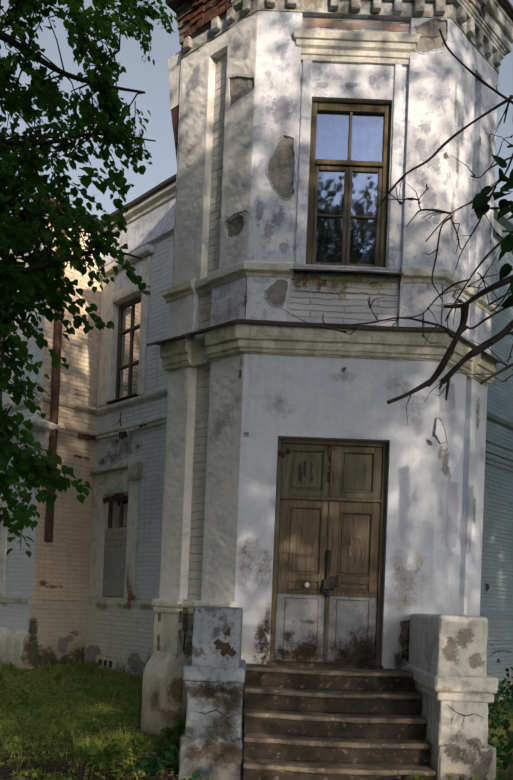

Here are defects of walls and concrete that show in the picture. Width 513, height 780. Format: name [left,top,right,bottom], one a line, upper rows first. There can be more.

flaking render [303,18,450,55]
flaking render [228,75,256,108]
flaking render [256,134,296,242]
flaking render [225,214,245,240]
flaking render [264,278,289,307]
flaking render [213,627,236,657]